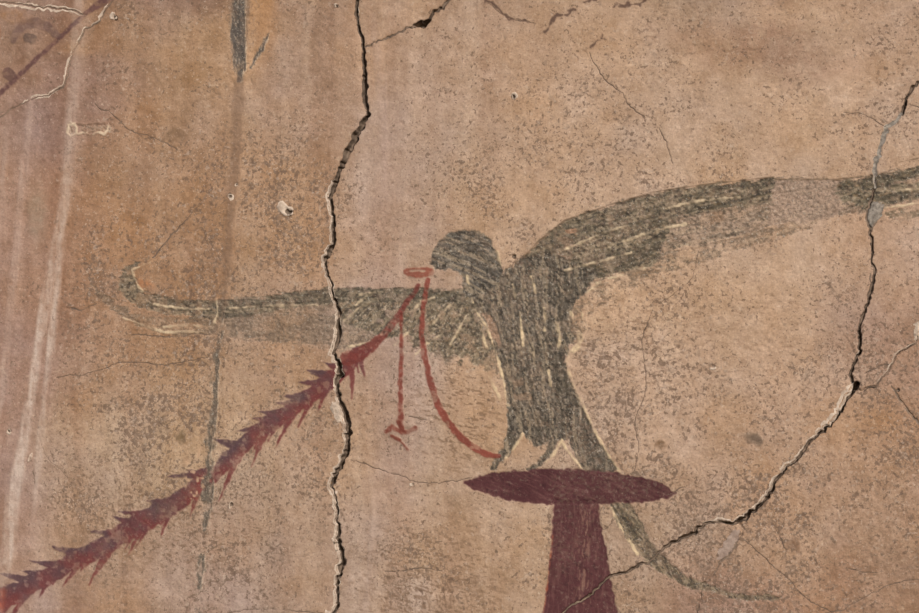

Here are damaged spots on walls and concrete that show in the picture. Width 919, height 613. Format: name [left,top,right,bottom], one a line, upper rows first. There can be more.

crack [0,0,111,118]
crack [229,0,472,613]
crack [589,52,673,164]
crack [562,81,919,613]